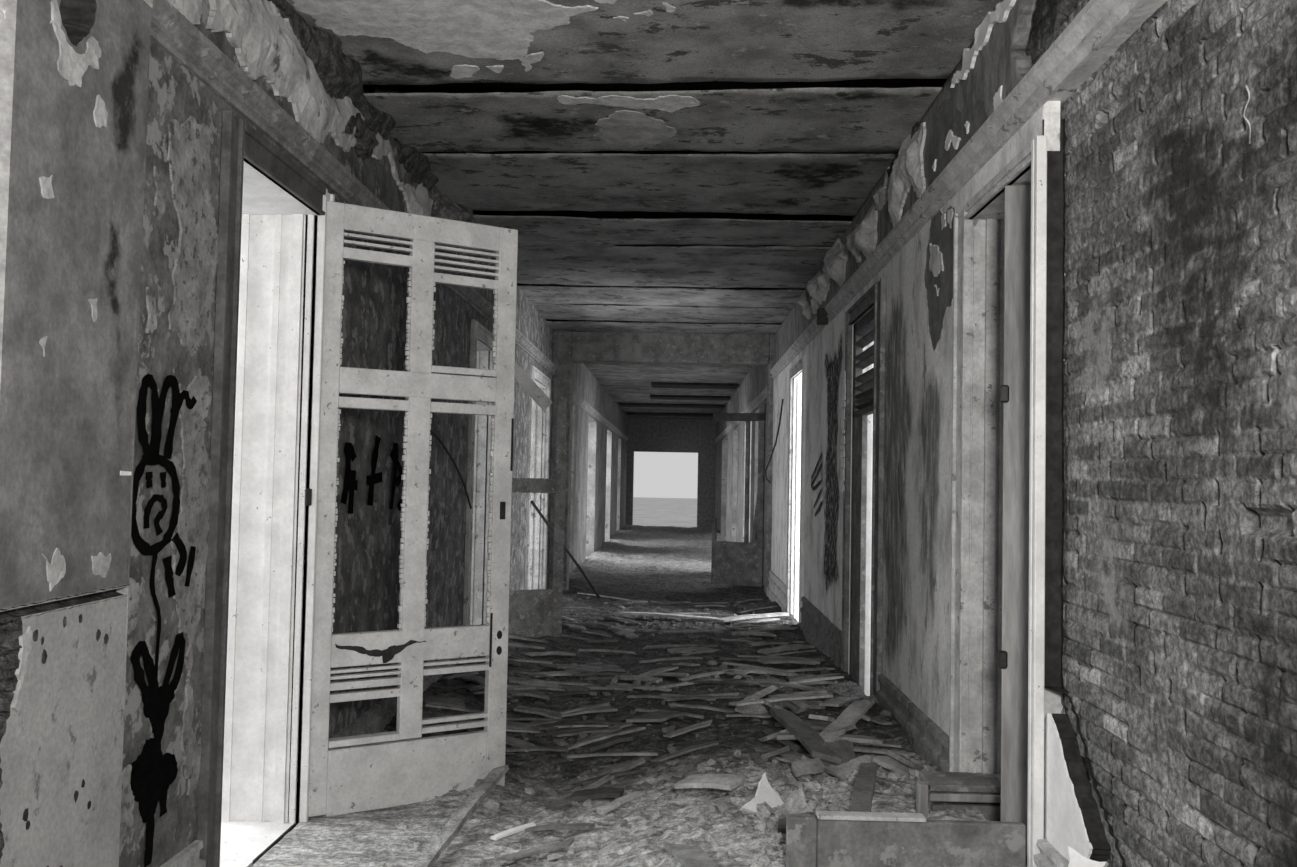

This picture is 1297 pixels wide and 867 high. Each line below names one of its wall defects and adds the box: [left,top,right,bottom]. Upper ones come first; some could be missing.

peeling [50,0,101,87]
peeling [267,0,676,223]
damp [502,115,597,137]
peeling [557,95,700,147]
damp [775,164,857,188]
damp [800,93,881,102]
spalling [797,162,894,320]
peeling [924,206,955,351]
peeling [911,0,1016,185]
damp [824,337,842,591]
damp [883,305,939,651]
spalling [0,617,33,789]